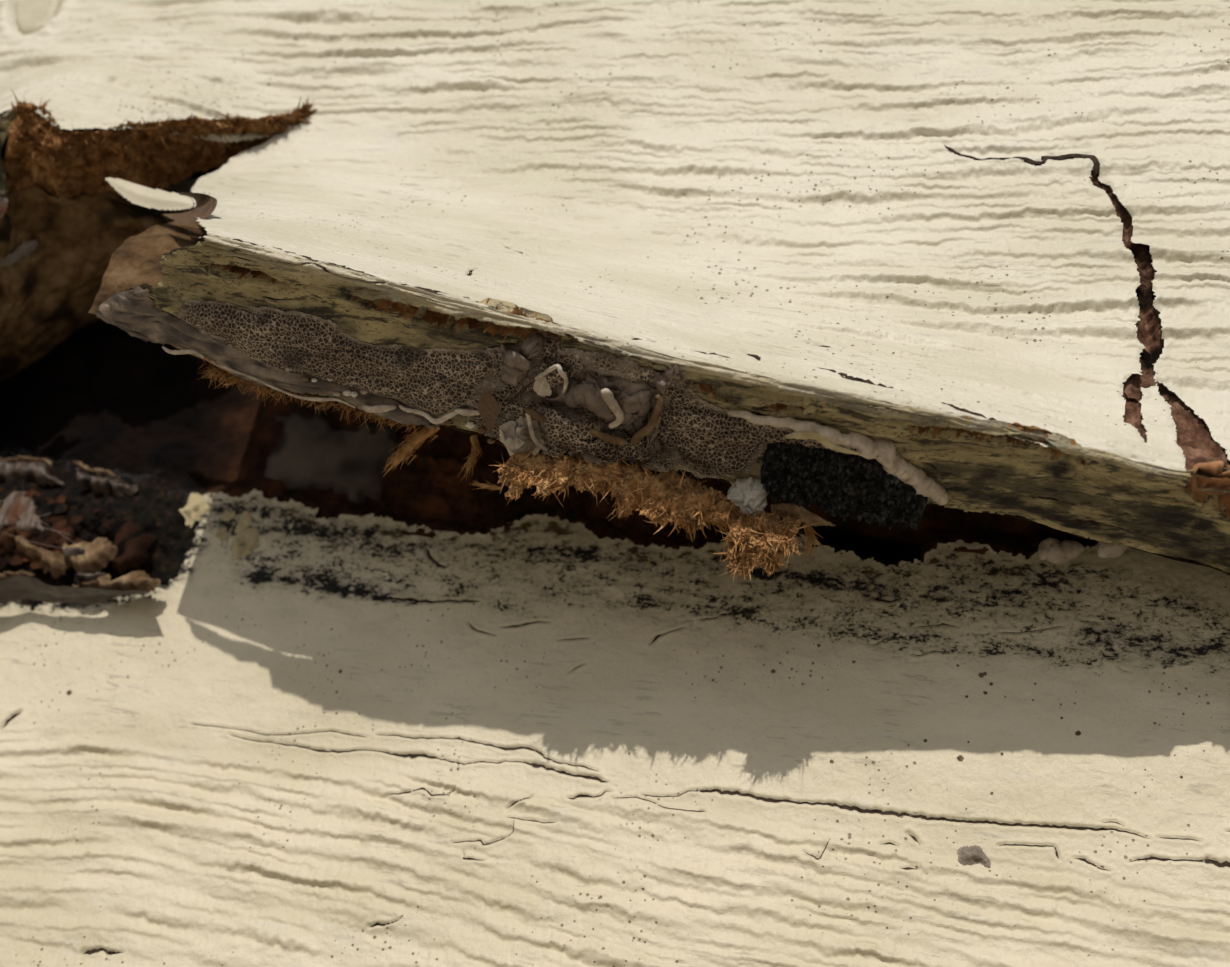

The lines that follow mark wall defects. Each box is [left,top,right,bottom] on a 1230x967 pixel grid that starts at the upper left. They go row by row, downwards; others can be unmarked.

peeling [0,196,9,223]
crack [944,145,1172,443]
peeling [179,493,260,549]
peeling [262,410,405,503]
water stain [3,459,1230,673]
spalling [1136,378,1230,519]
crack [192,724,1230,871]